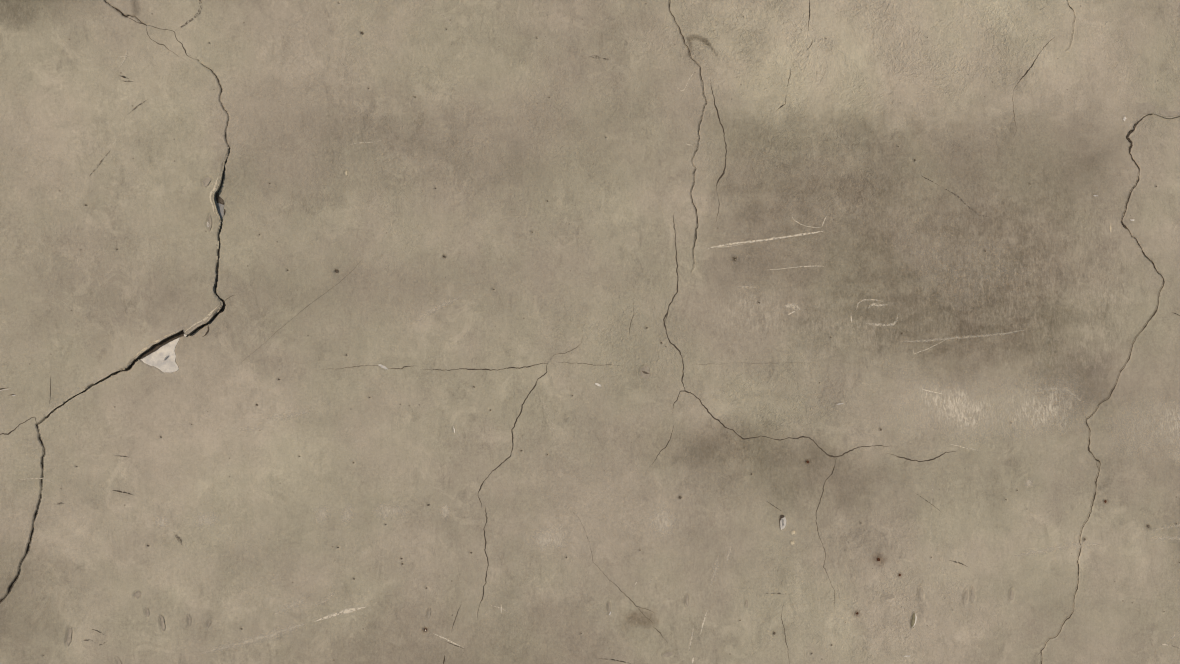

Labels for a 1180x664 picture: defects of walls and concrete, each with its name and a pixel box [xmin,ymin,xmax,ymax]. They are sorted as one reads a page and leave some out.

crack [105,0,230,192]
crack [1012,0,1076,121]
crack [0,358,139,602]
spalling [136,331,187,373]
crack [188,220,228,336]
crack [342,337,620,632]
crack [655,0,955,606]
crack [1040,115,1165,664]